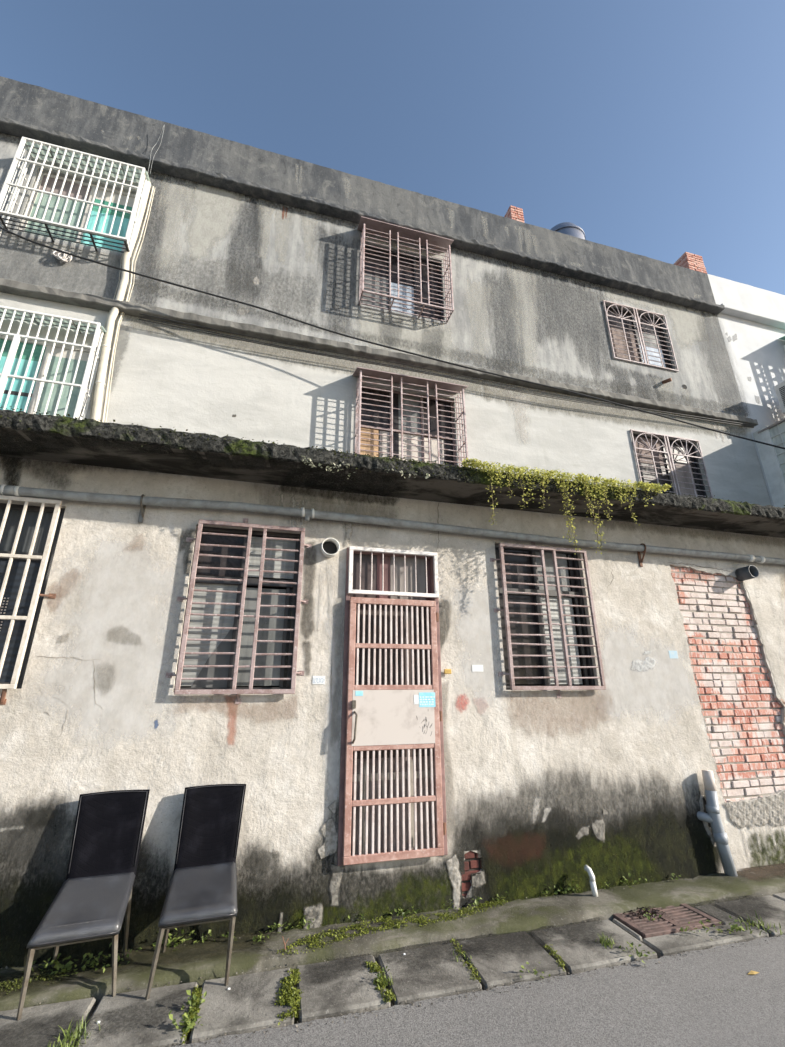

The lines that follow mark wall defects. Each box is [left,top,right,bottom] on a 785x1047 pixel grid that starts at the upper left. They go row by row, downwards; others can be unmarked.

damp [135,169,744,411]
damp [302,543,341,830]
damp [439,588,498,700]
damp [600,632,697,719]
damp [0,798,75,896]
damp [132,845,172,904]
flaking render [461,851,482,898]
damp [236,773,720,924]